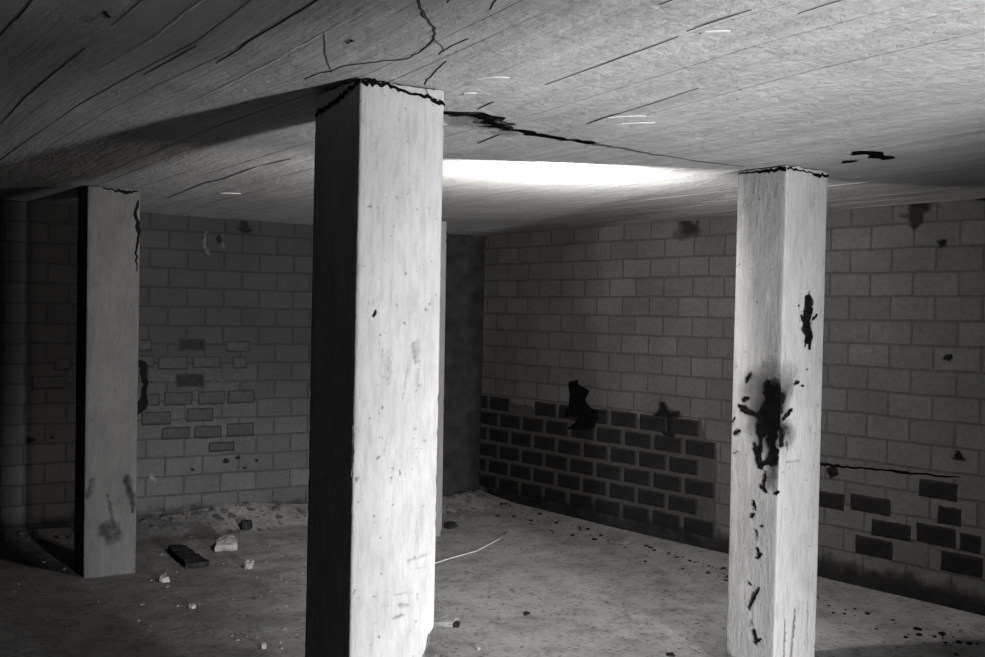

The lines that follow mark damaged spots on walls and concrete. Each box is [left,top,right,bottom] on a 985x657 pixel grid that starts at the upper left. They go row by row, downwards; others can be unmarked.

crack [143,46,196,75]
crack [216,0,319,64]
crack [305,0,895,178]
crack [168,159,289,198]
crack [103,188,141,271]
peeling [138,338,258,469]
water stain [748,581,762,646]